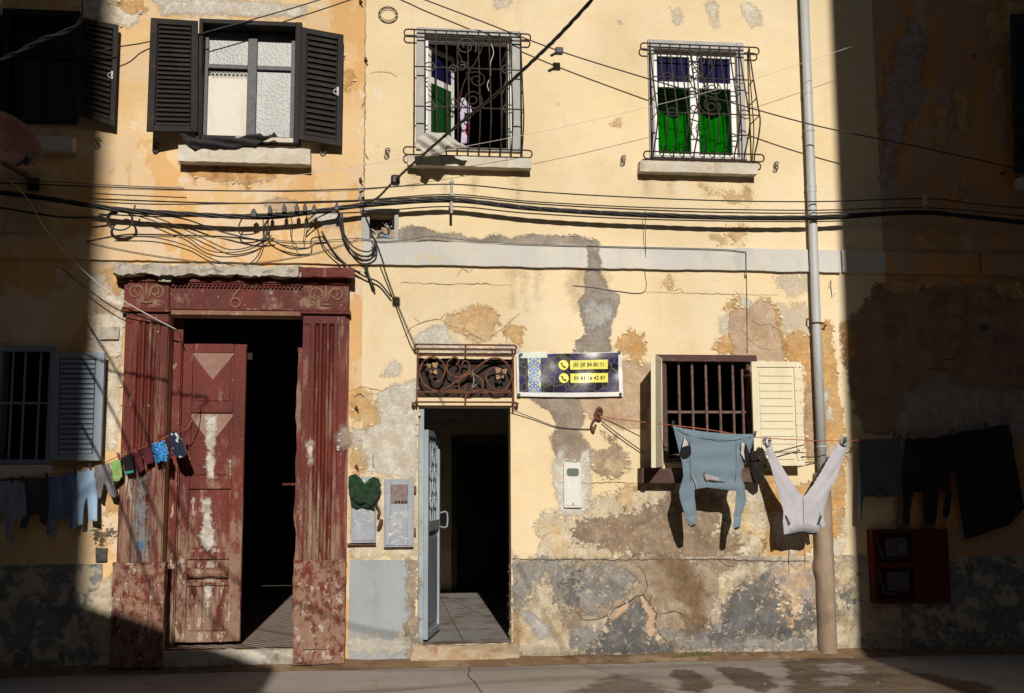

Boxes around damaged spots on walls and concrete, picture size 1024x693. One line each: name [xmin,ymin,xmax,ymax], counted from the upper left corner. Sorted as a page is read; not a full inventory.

peeling [444,304,527,347]
peeling [335,378,421,479]
peeling [712,281,1024,540]
flaking render [508,327,816,656]
peeling [87,571,113,656]
crack [512,549,807,641]